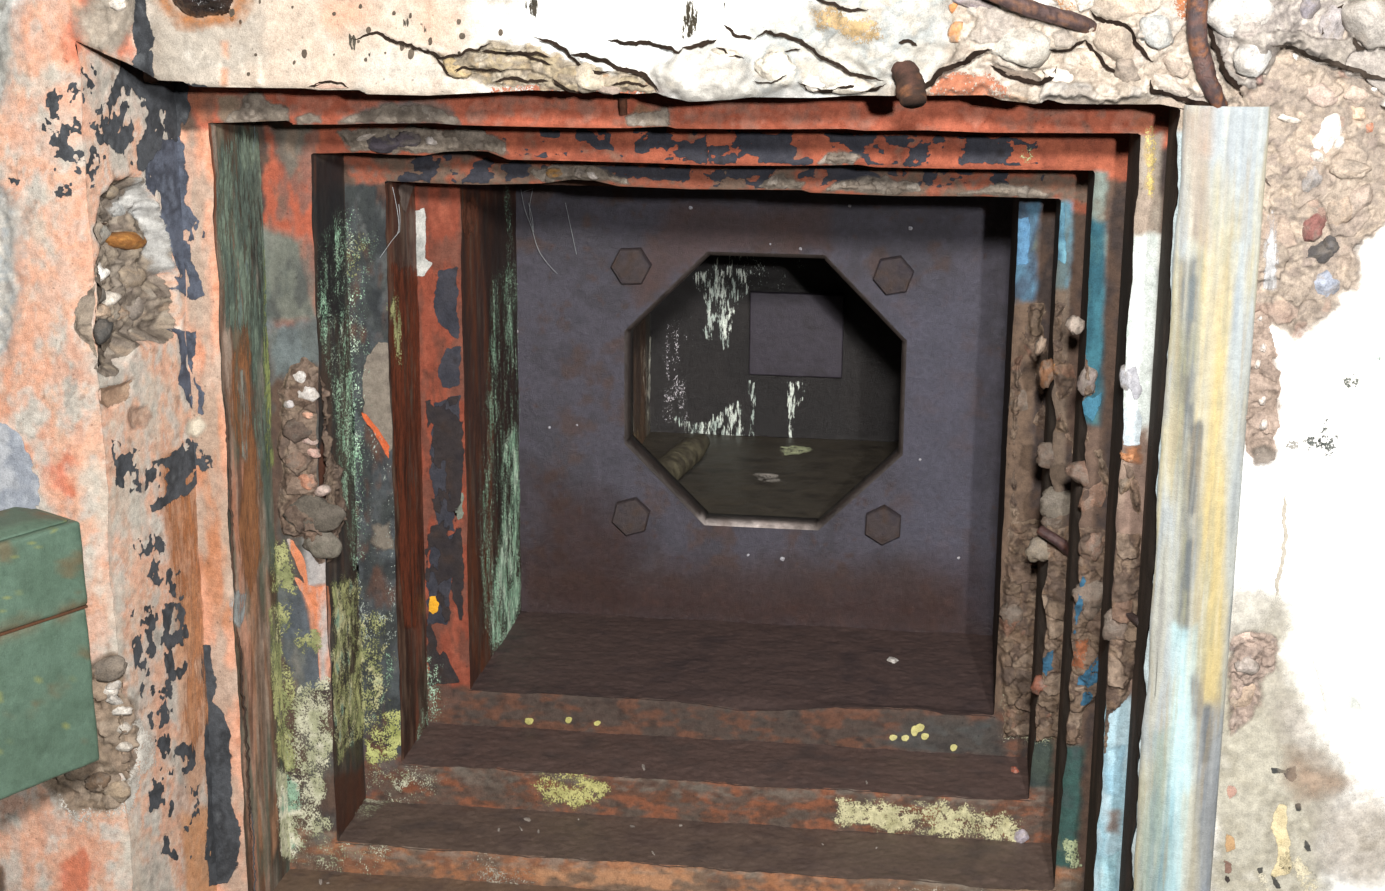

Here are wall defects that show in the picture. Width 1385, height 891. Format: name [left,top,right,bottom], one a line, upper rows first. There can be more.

spalling [39,0,207,415]
rust [159,0,246,28]
crack [309,80,348,89]
spalling [337,31,1050,212]
spalling [609,0,1385,465]
spalling [46,533,241,887]
rust [164,469,208,751]
rust [227,321,263,596]
spalling [277,357,348,682]
peeling [362,342,393,458]
spalling [998,302,1142,753]
damp [1210,586,1385,891]